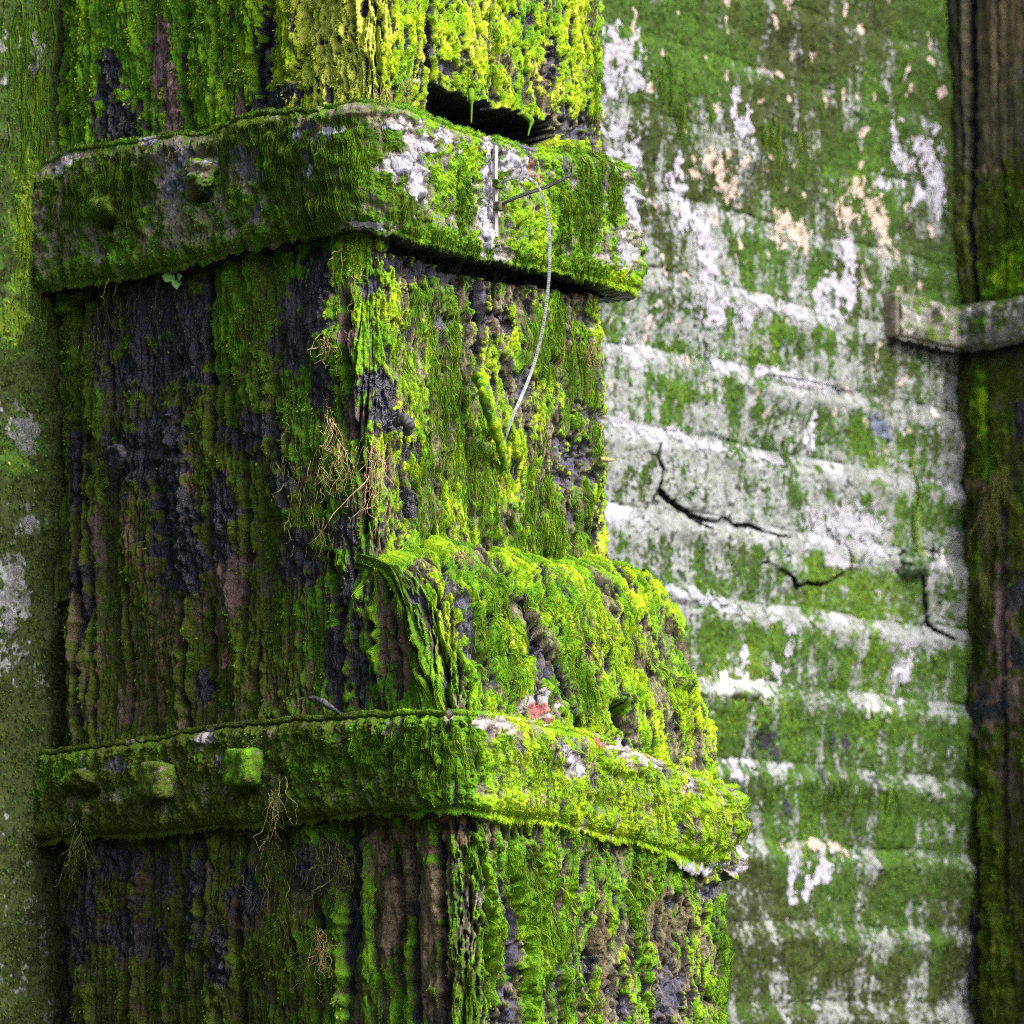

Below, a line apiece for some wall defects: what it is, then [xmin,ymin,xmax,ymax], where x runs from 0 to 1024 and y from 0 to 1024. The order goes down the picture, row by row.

crack [653,441,791,537]
leakage [912,455,953,576]
crack [760,526,853,596]
crack [898,543,955,640]
leakage [734,644,754,685]
leakage [772,625,797,686]
leakage [863,641,920,719]
leakage [786,840,834,914]